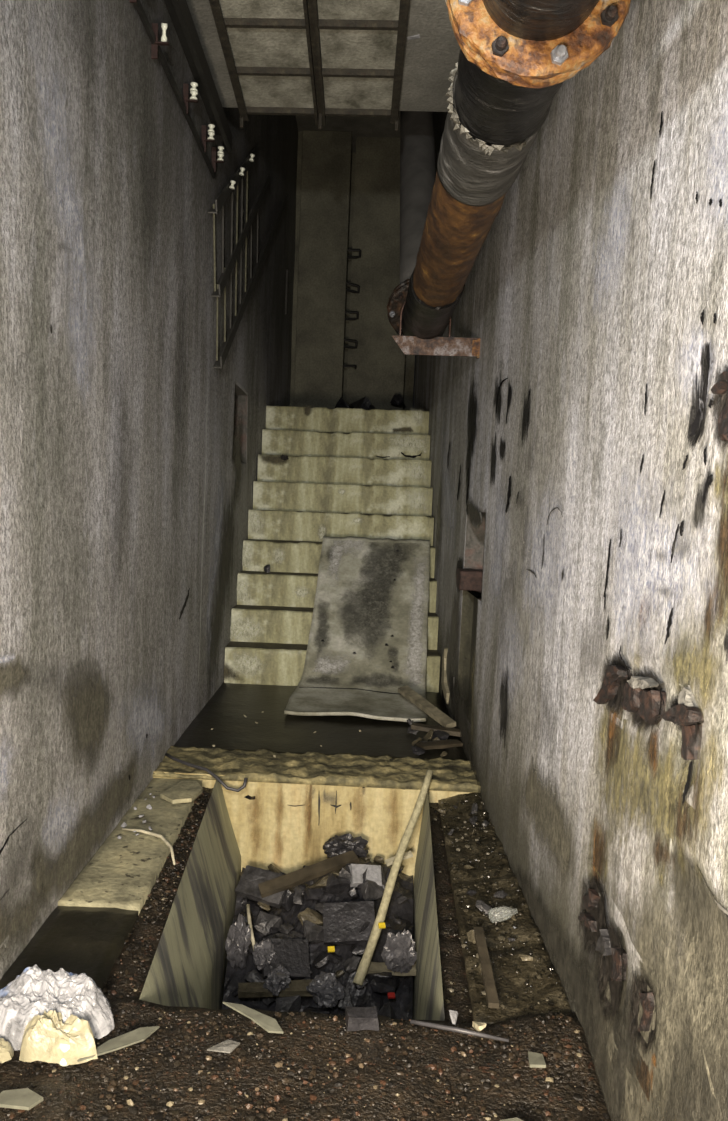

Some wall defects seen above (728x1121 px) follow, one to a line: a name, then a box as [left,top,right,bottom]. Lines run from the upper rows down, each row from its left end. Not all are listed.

rust [672,454,728,699]
crack [0,818,28,854]